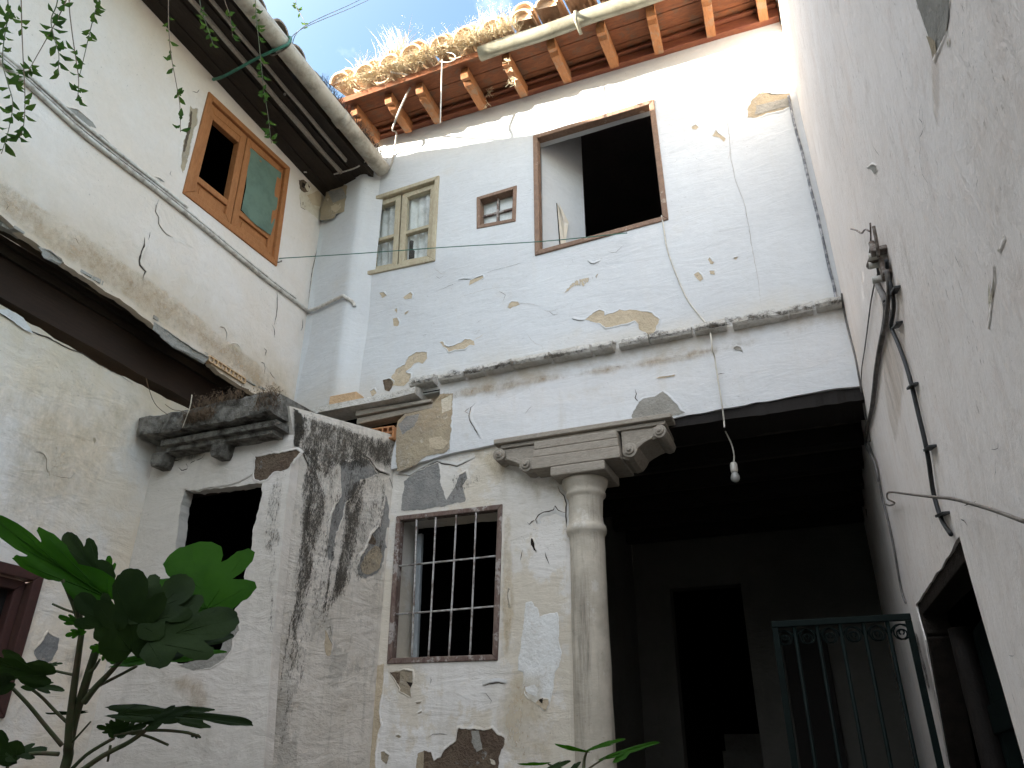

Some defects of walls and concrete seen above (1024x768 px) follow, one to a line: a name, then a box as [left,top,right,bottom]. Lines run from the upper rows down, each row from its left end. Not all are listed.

spalling [745,89,794,119]
crack [130,200,173,284]
peeling [585,308,661,335]
peeling [370,351,429,396]
peeling [630,373,687,418]
crack [344,404,483,487]
flaking render [183,447,304,492]
spalling [356,389,470,578]
crack [520,484,569,563]
damp [281,417,394,715]
peeling [32,630,59,662]
spalling [416,725,507,768]